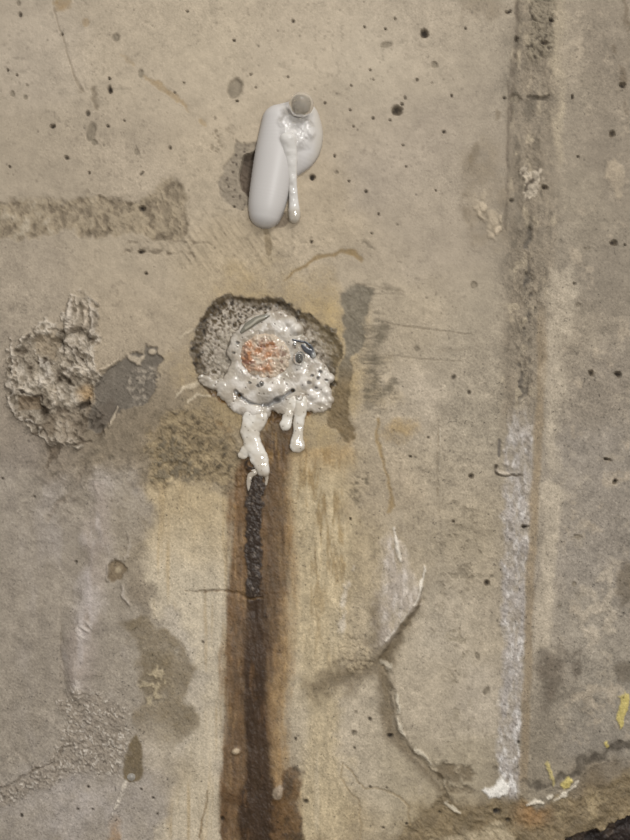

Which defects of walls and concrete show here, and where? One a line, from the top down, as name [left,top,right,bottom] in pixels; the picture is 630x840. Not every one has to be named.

spalling [4,288,165,451]
damp [0,450,225,840]
rust [214,411,308,840]
damp [158,91,630,840]
crack [378,658,480,815]